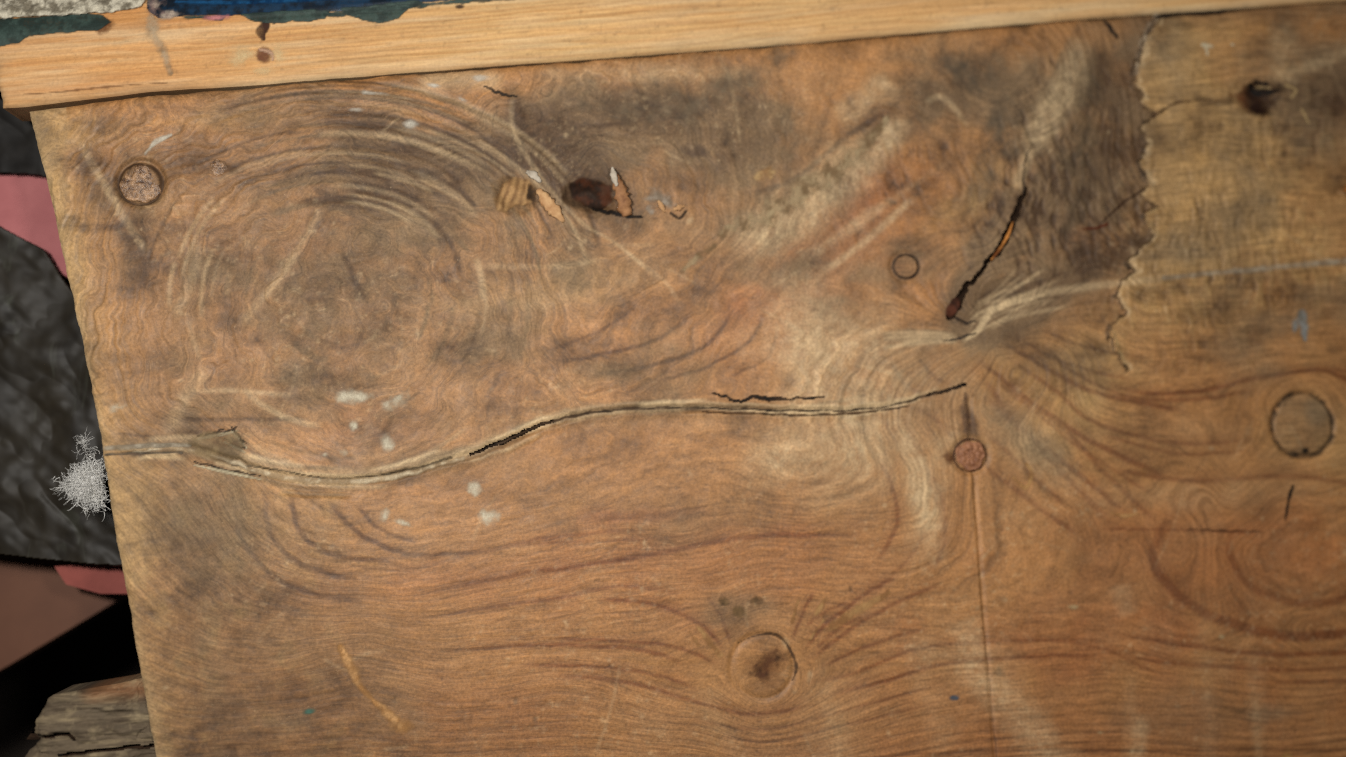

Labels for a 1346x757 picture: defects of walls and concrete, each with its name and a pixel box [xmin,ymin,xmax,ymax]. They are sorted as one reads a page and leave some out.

crack [1104,20,1118,39]
crack [1152,99,1220,117]
crack [1083,189,1146,230]
crack [945,152,1028,341]
crack [104,383,964,484]